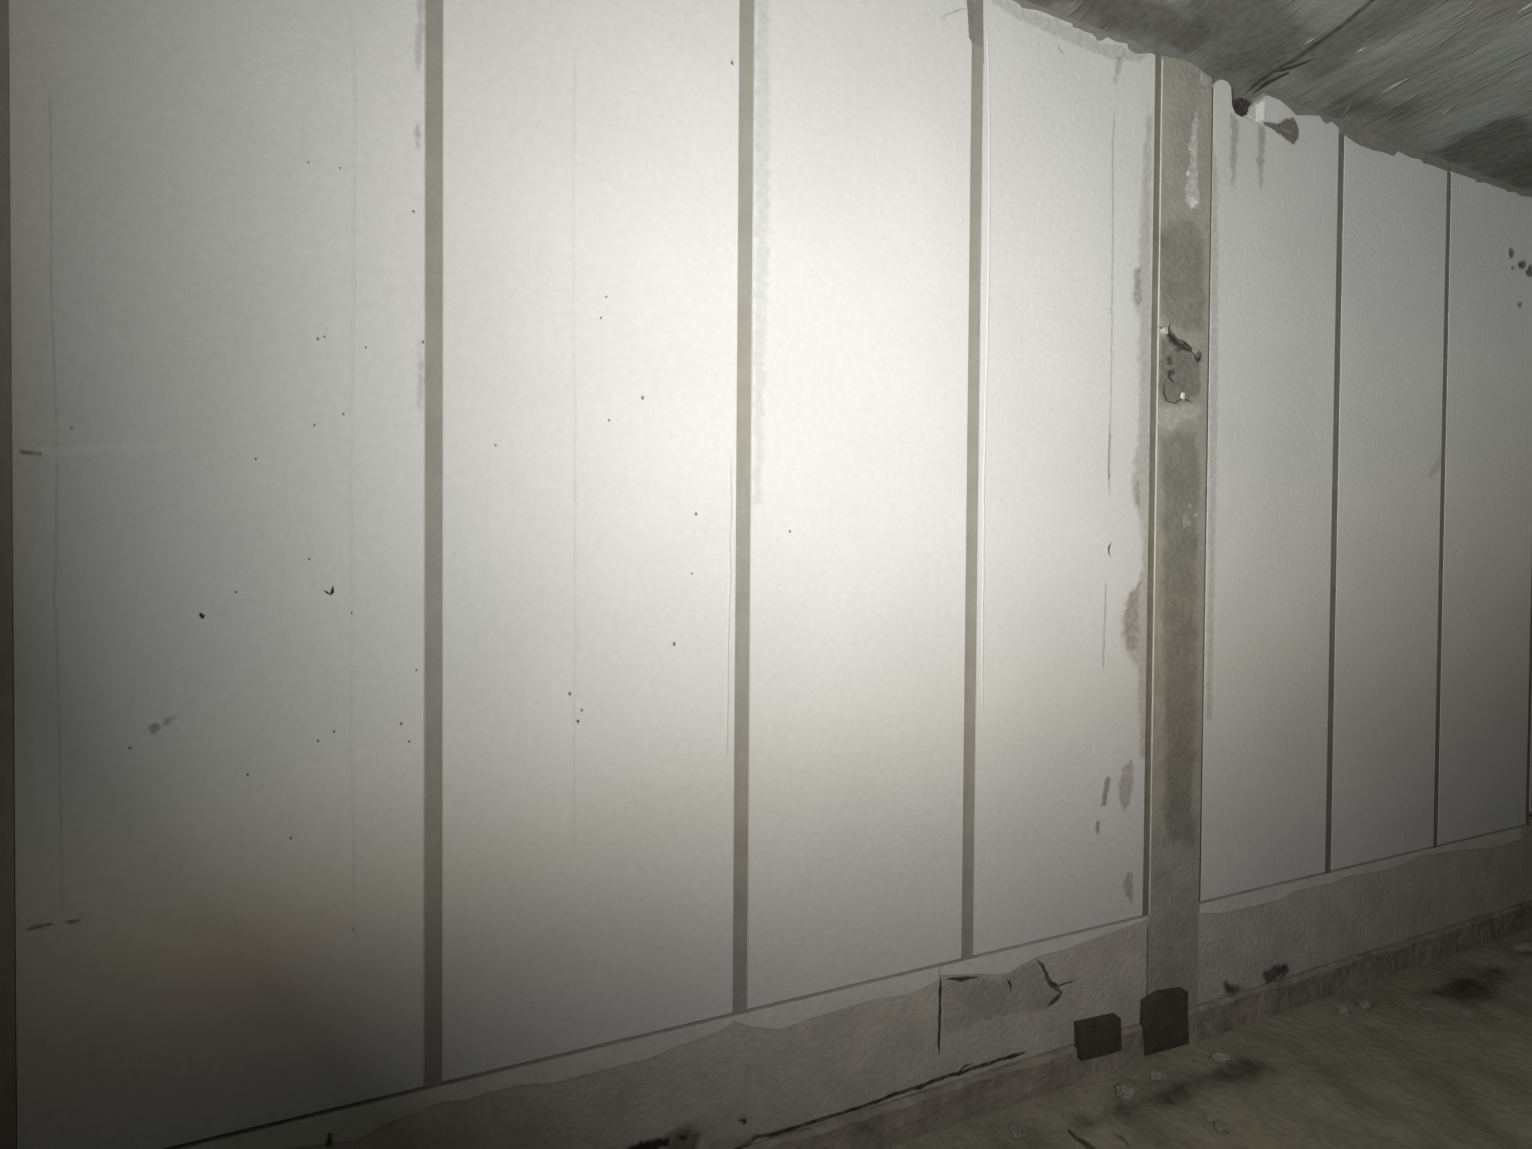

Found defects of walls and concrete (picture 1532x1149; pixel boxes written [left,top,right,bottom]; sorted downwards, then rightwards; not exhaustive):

water stain [1185,112,1199,210]
crack [713,977,1026,1149]
spalling [629,1136,686,1149]